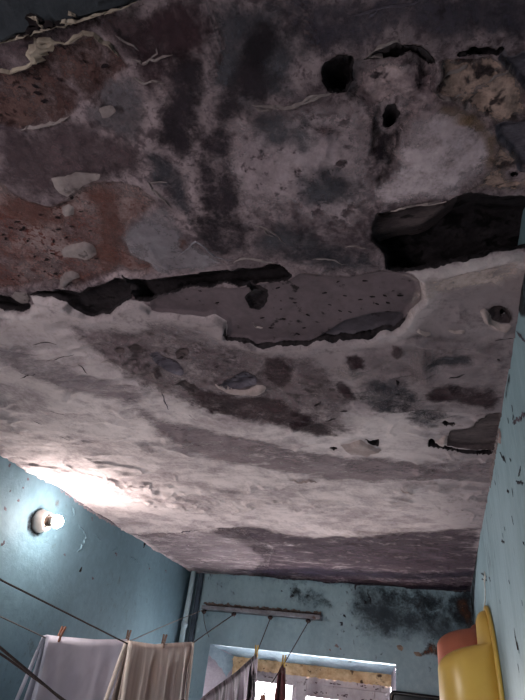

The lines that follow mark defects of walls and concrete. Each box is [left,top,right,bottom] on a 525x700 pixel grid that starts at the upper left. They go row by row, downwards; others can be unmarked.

spalling [0,30,127,131]
leakage [0,0,525,273]
spalling [150,40,525,344]
leakage [31,325,445,436]
peeling [215,384,266,396]
leakage [431,356,469,366]
leakage [428,385,498,407]
spalling [435,405,515,488]
leakage [135,527,480,639]